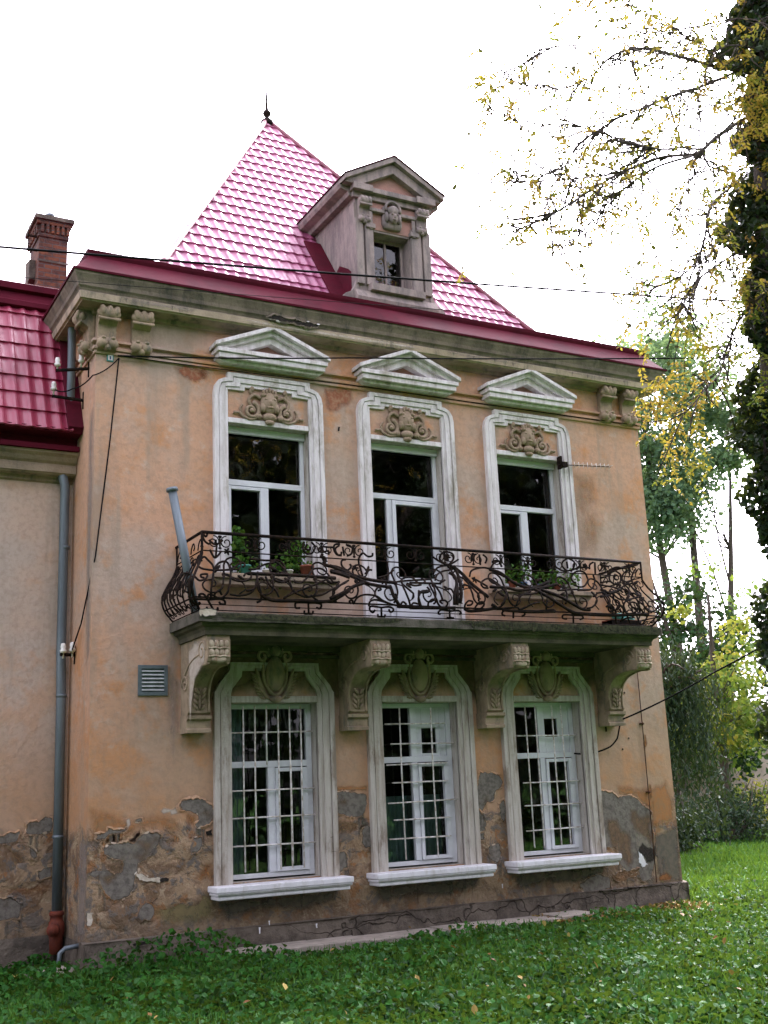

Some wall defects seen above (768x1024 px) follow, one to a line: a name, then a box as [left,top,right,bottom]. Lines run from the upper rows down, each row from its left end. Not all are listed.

flaking render [0,816,53,862]
flaking render [88,817,164,925]
flaking render [177,795,214,841]
flaking render [339,850,349,876]
flaking render [337,790,371,852]
flaking render [477,770,506,871]
flaking render [579,789,656,893]
flaking render [85,911,94,927]